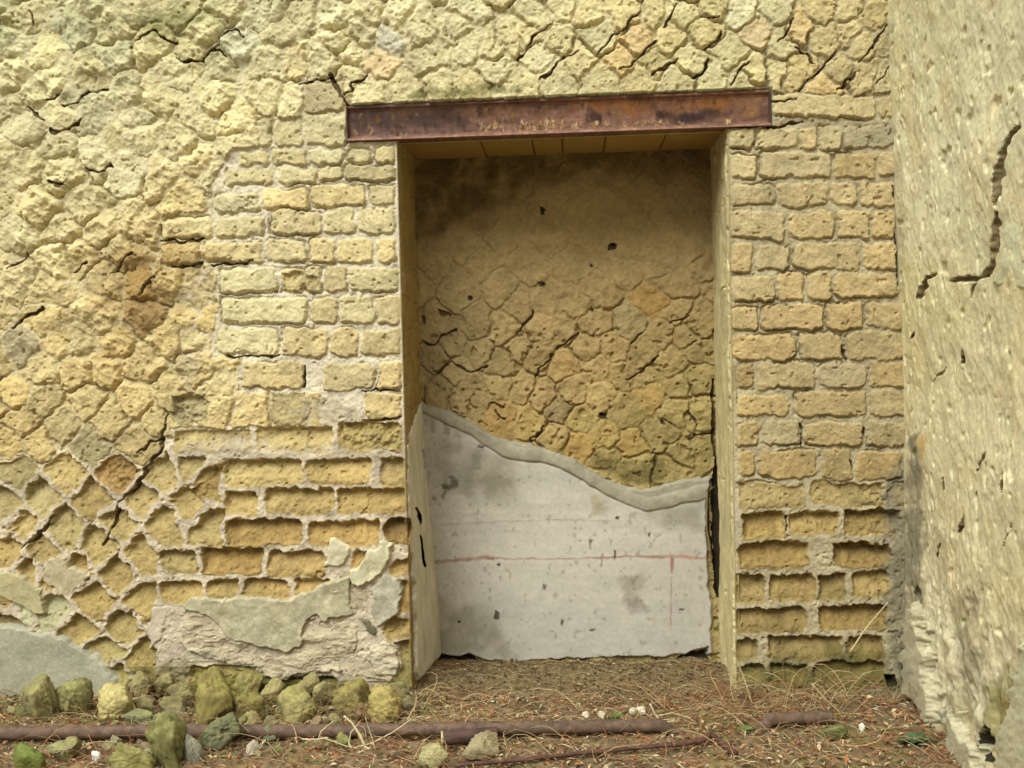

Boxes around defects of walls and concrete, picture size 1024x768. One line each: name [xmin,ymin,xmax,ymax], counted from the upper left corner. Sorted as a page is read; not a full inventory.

crack [28,89,109,135]
crack [130,28,245,64]
crack [298,72,368,106]
crack [767,18,888,129]
crack [47,163,114,187]
crack [893,125,1021,299]
crack [137,237,253,296]
crack [12,306,45,329]
crack [422,309,488,374]
crack [102,414,169,547]
crack [687,378,720,597]
flaking render [180,517,413,682]